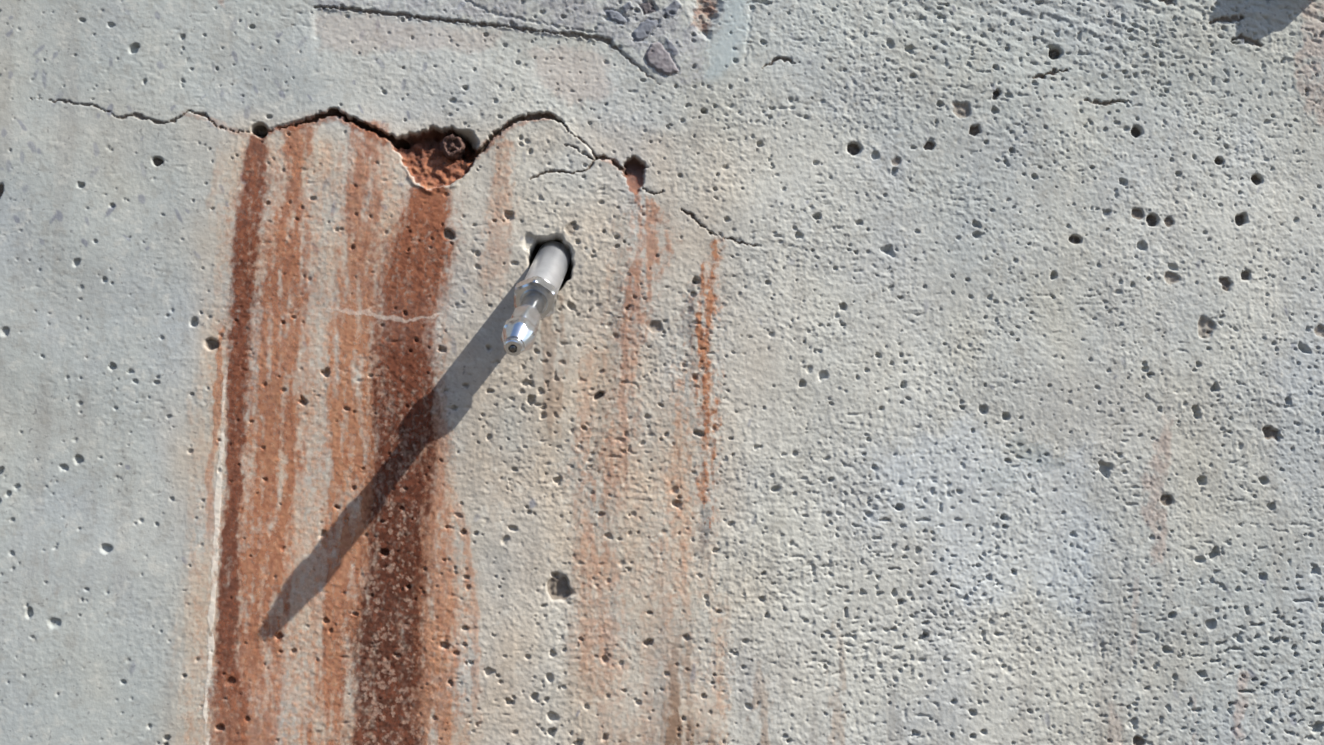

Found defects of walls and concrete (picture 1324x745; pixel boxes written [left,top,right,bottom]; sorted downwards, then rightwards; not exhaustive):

spalling [571,0,717,75]
crack [271,108,410,149]
spalling [394,129,478,190]
crack [472,113,756,247]
spalling [624,158,645,194]
corrosion [212,124,315,745]
corrosion [287,122,457,745]
corrosion [694,240,722,528]